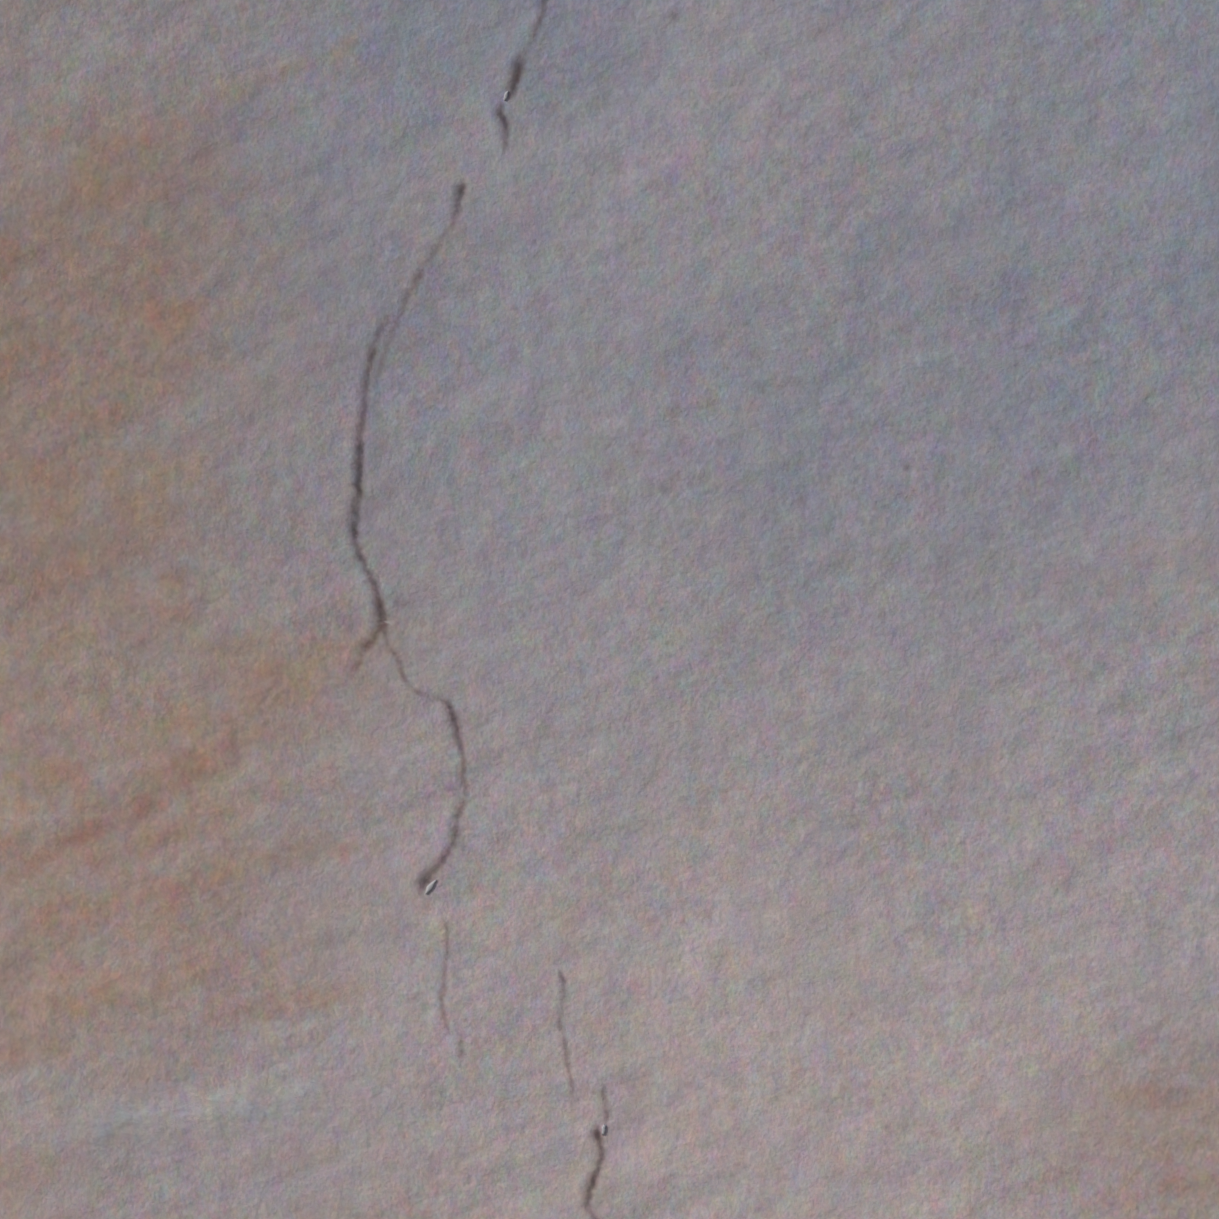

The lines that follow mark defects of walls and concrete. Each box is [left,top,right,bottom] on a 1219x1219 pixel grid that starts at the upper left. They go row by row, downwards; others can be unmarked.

crack [499,64,521,122]
crack [355,445,363,495]
crack [368,599,385,645]
crack [422,832,456,894]
crack [595,1124,606,1142]